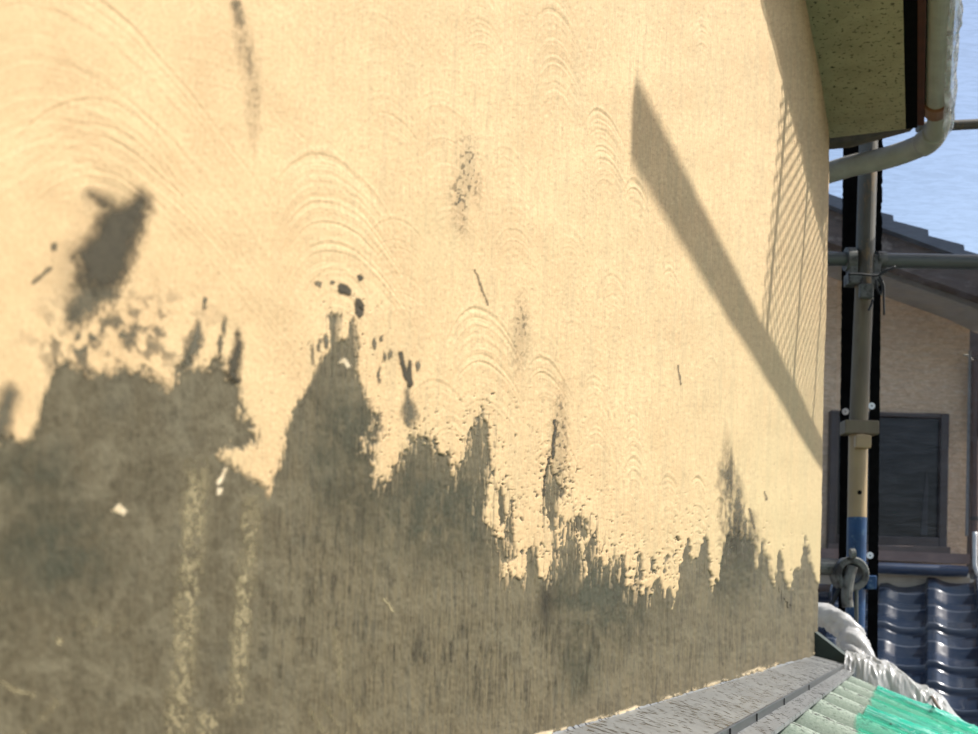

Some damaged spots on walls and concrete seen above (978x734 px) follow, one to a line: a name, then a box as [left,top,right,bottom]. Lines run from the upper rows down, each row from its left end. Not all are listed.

damp [184,322,203,367]
damp [217,316,243,384]
damp [373,335,420,427]
damp [405,473,486,540]
damp [720,467,753,577]
damp [168,472,218,734]
damp [231,503,257,705]
damp [544,569,640,627]